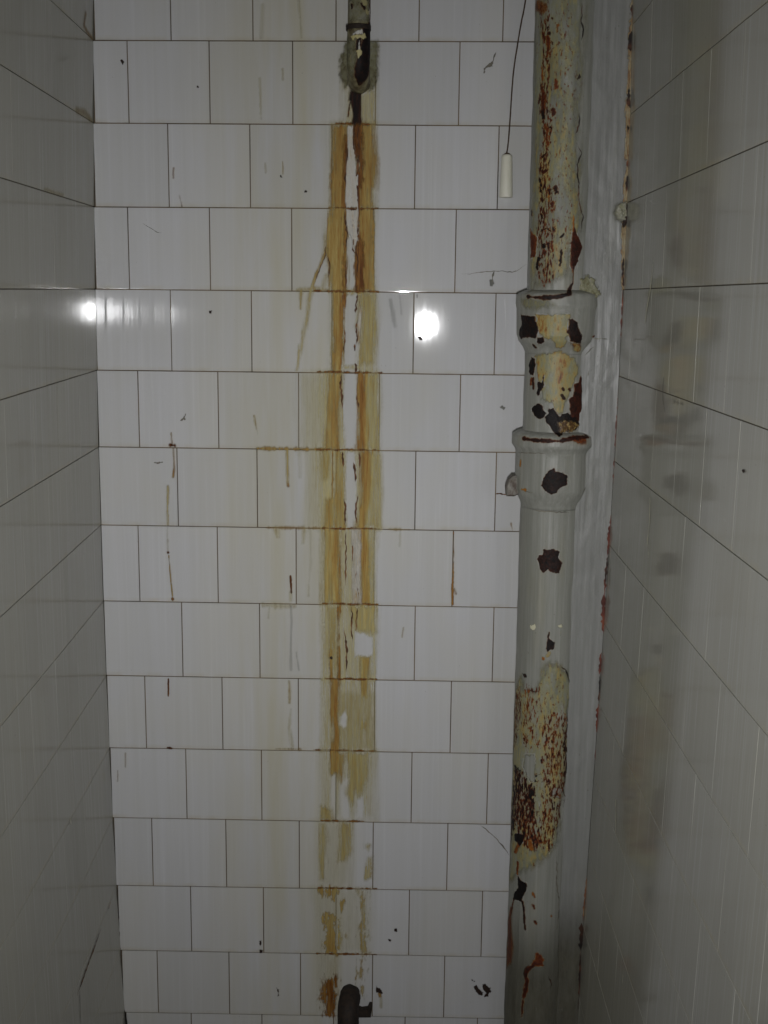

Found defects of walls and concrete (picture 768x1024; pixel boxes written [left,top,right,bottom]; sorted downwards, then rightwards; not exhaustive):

peeling [519,0,595,437]
rust [257,0,382,803]
spalling [536,548,562,573]
spalling [541,468,569,495]
rust [316,807,377,995]
rust [319,975,337,1017]